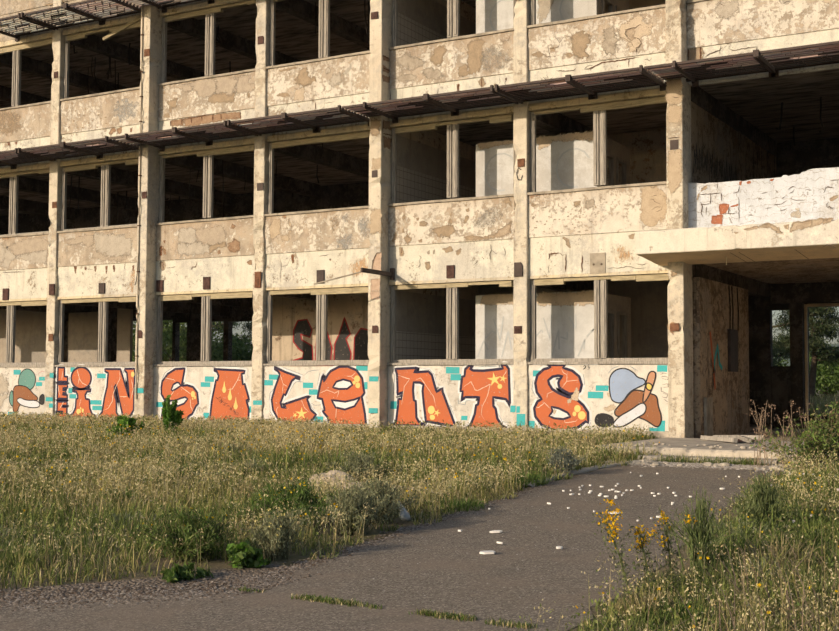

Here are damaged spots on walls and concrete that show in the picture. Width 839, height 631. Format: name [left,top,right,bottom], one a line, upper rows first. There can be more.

peeling [712,0,740,19]
peeling [276,67,316,101]
peeling [382,45,447,99]
peeling [458,38,485,77]
peeling [532,30,592,63]
spalling [601,14,653,56]
flaking render [711,203,738,224]
peeling [177,223,240,257]